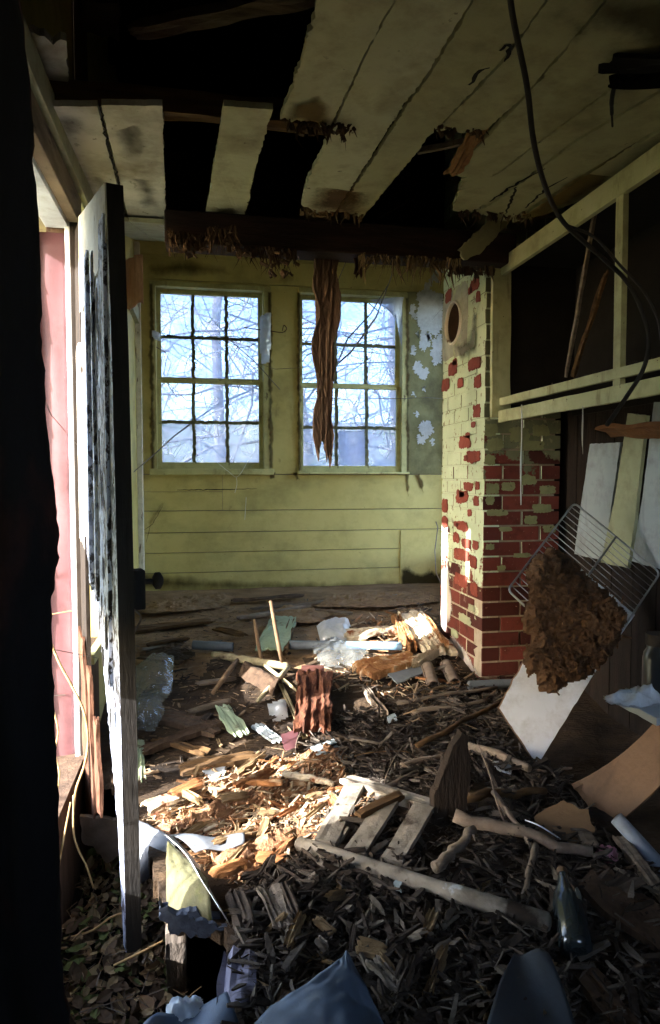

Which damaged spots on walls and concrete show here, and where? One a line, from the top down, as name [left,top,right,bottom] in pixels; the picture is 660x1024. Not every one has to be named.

water stain [315,185,362,213]
crack [489,169,567,214]
peeling [414,411,435,446]
peeling [459,404,545,465]
peeling [442,474,556,638]